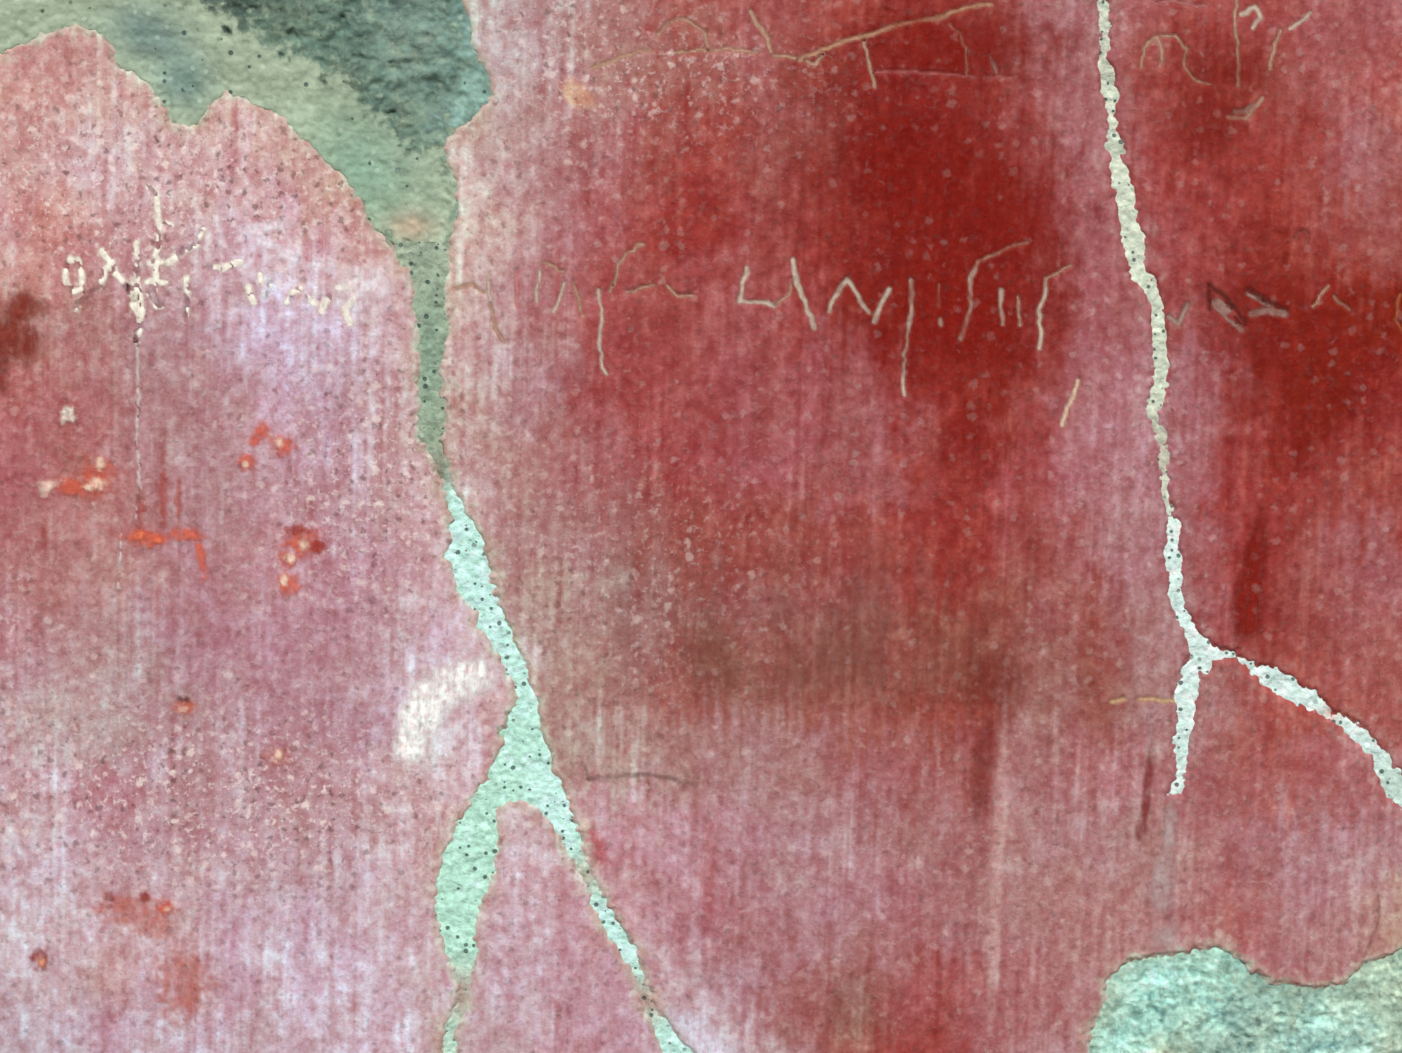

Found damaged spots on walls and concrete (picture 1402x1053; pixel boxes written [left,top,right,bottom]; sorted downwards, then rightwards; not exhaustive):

spalling [0,0,492,256]
peeling [61,407,74,422]
peeling [41,457,107,496]
peeling [239,424,291,470]
crack [1097,0,1402,810]
spalling [1088,947,1402,1053]